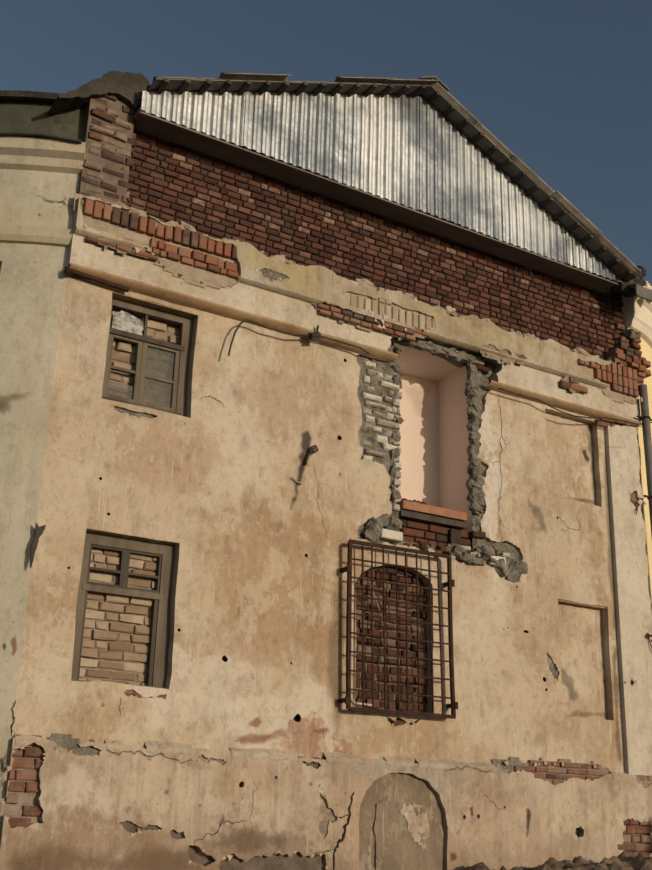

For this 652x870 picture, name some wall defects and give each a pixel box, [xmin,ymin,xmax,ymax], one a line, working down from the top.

flaking render [73,193,239,289]
spalling [255,268,289,282]
flaking render [560,336,651,404]
spalling [313,287,528,588]
crack [493,395,507,543]
flaking render [0,733,102,828]
spalling [117,821,328,870]
crack [194,781,256,843]
flaking render [492,757,609,785]
flaking render [618,817,652,856]